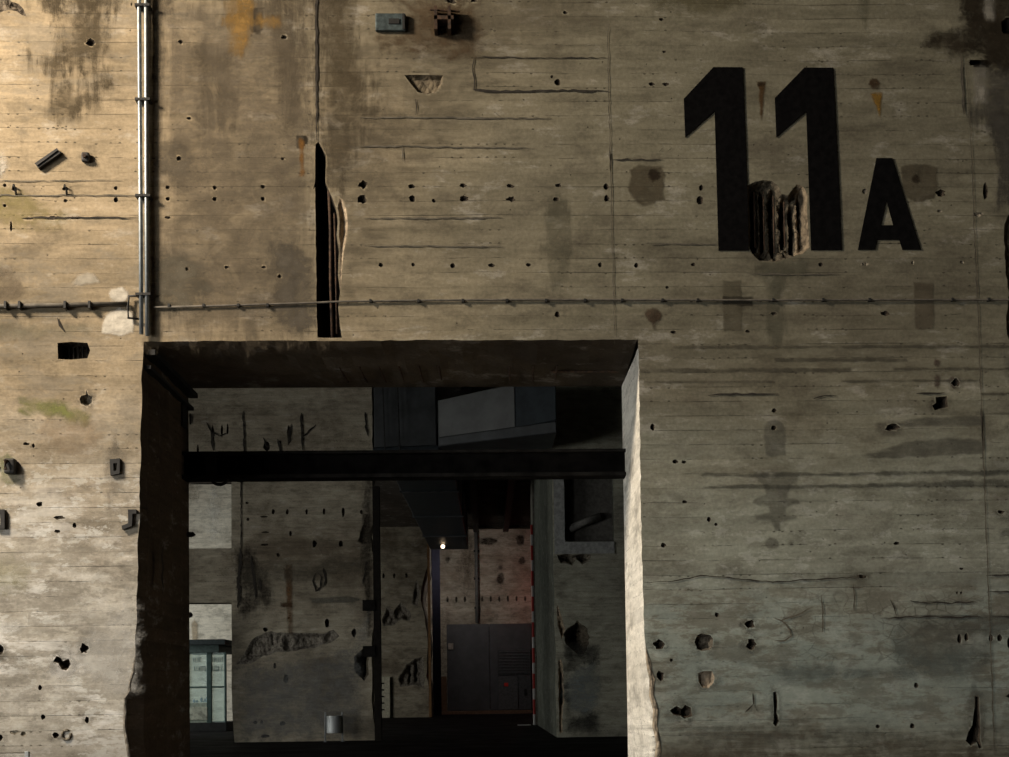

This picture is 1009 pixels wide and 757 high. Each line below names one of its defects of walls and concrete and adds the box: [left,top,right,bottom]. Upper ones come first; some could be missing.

leakage [42,0,118,121]
rust [227,0,279,53]
leakage [925,0,1009,204]
spalling [747,180,810,262]